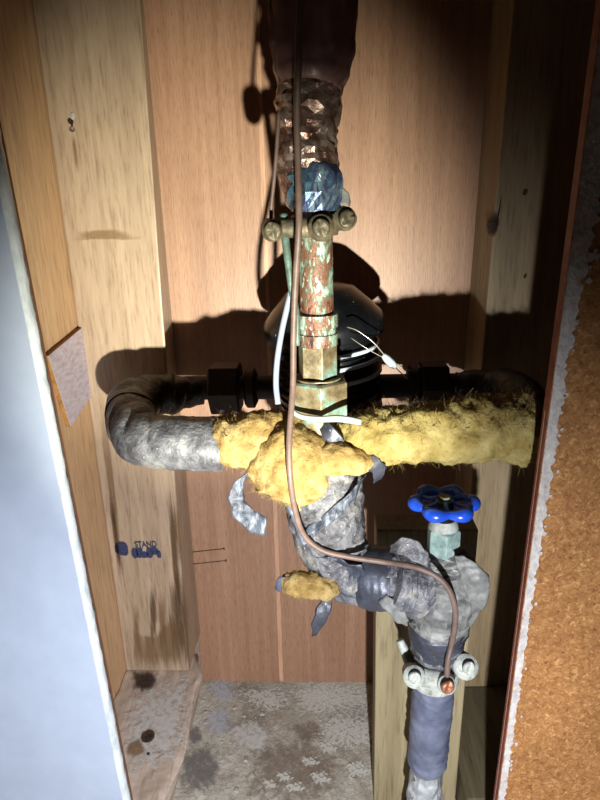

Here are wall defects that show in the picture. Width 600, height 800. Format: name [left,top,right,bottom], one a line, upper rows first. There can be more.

damp [135,513,188,663]
damp [133,673,156,690]
damp [128,741,144,756]